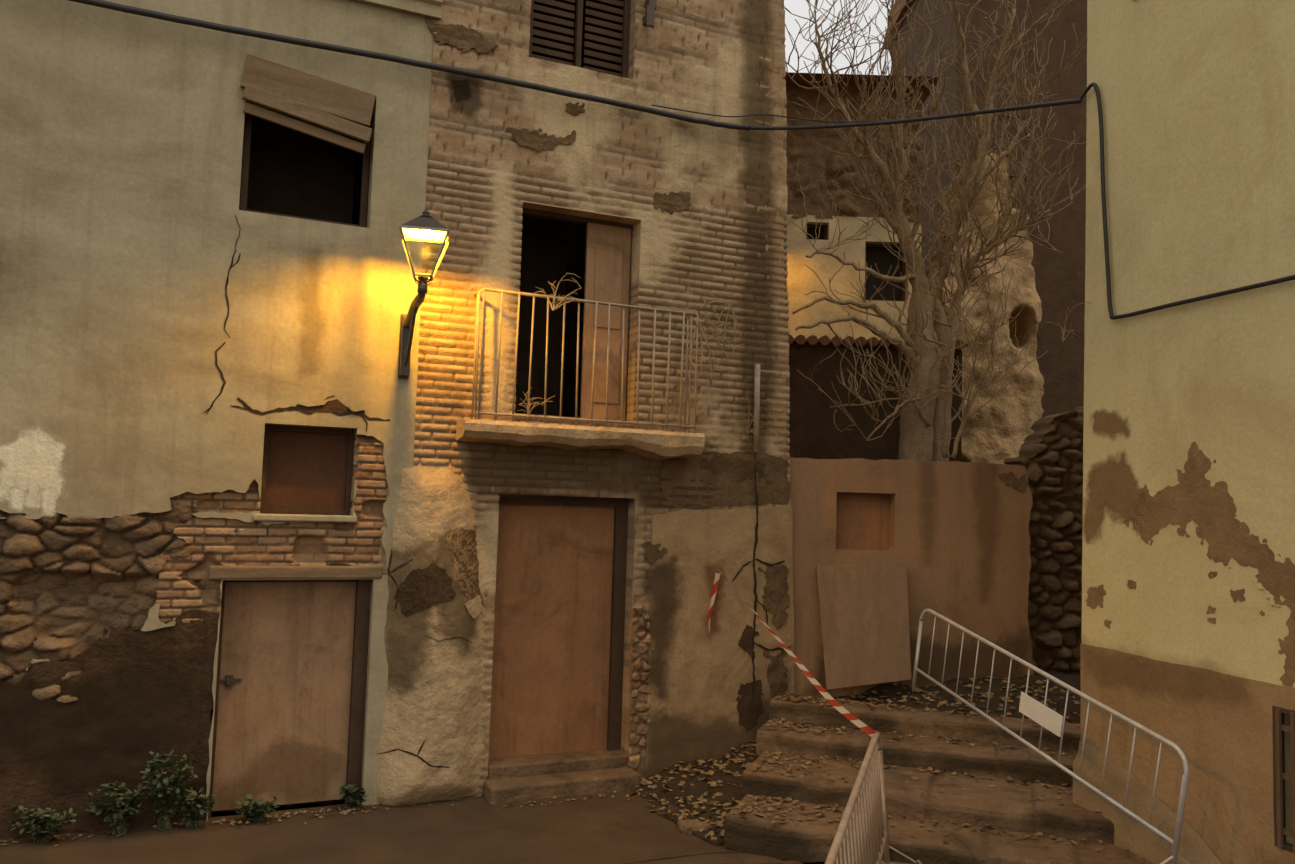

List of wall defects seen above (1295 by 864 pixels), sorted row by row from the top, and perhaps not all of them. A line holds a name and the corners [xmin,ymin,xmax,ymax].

crack [203,215,390,432]
spalling [295,398,365,417]
spalling [0,427,389,703]
peeling [1084,442,1295,687]